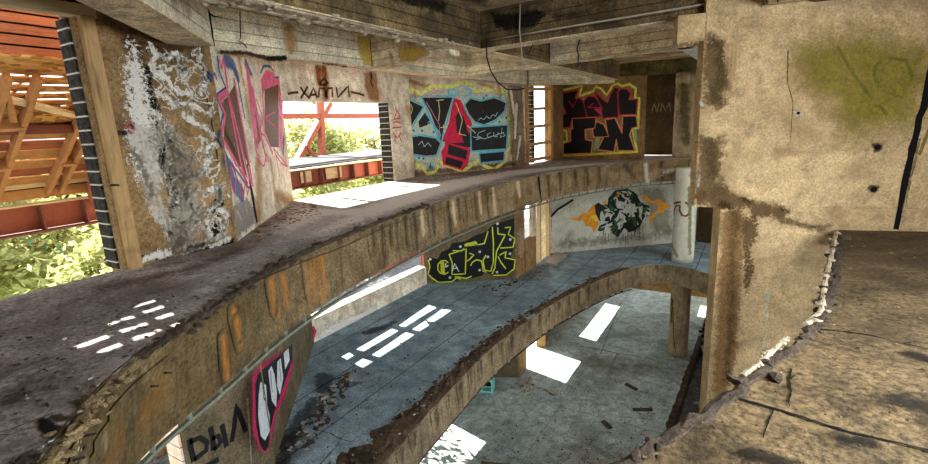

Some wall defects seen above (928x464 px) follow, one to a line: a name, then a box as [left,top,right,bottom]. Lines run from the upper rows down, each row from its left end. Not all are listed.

leakage [402,0,446,14]
leakage [491,10,577,30]
leakage [678,35,744,111]
leakage [118,29,235,264]
leakage [545,166,603,199]
leakage [621,160,676,183]
leakage [688,134,826,401]
spalling [36,198,430,464]
spalling [589,230,852,464]